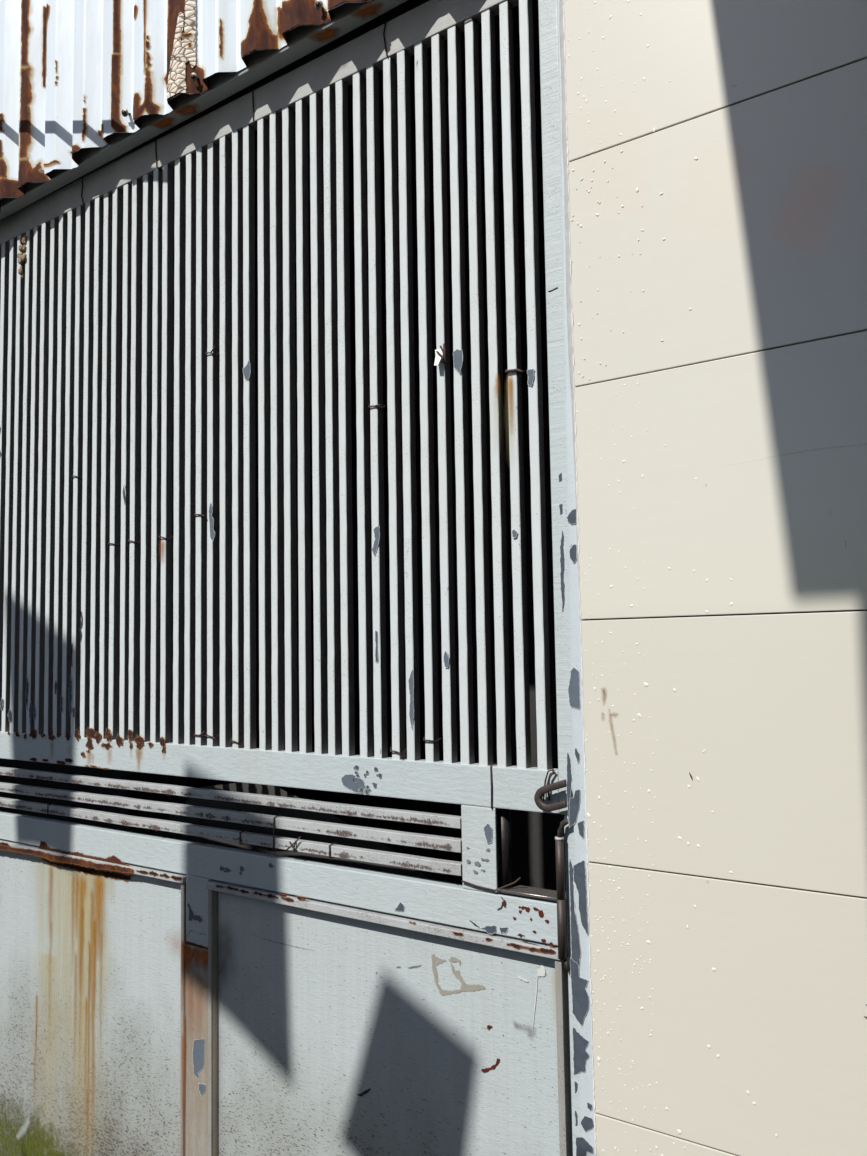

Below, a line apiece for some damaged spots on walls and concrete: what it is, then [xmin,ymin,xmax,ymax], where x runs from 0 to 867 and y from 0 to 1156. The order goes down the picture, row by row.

rust [241,0,381,56]
rust [0,0,208,198]
rust [0,727,447,842]
peeling [341,765,381,795]
rust [0,841,181,1045]
rust [181,941,208,981]
rust [502,900,555,954]
peeling [566,727,596,1156]